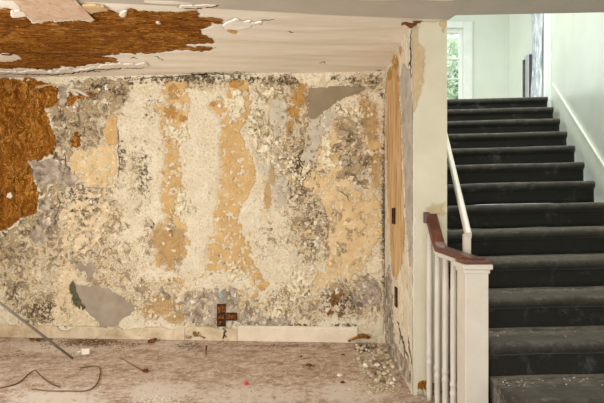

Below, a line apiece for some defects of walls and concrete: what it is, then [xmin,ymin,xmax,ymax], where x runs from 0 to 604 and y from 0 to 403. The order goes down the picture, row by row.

spalling [0,3,263,329]
peeling [183,79,292,328]
peeling [292,58,415,383]
crack [380,105,388,287]
crack [383,309,412,365]